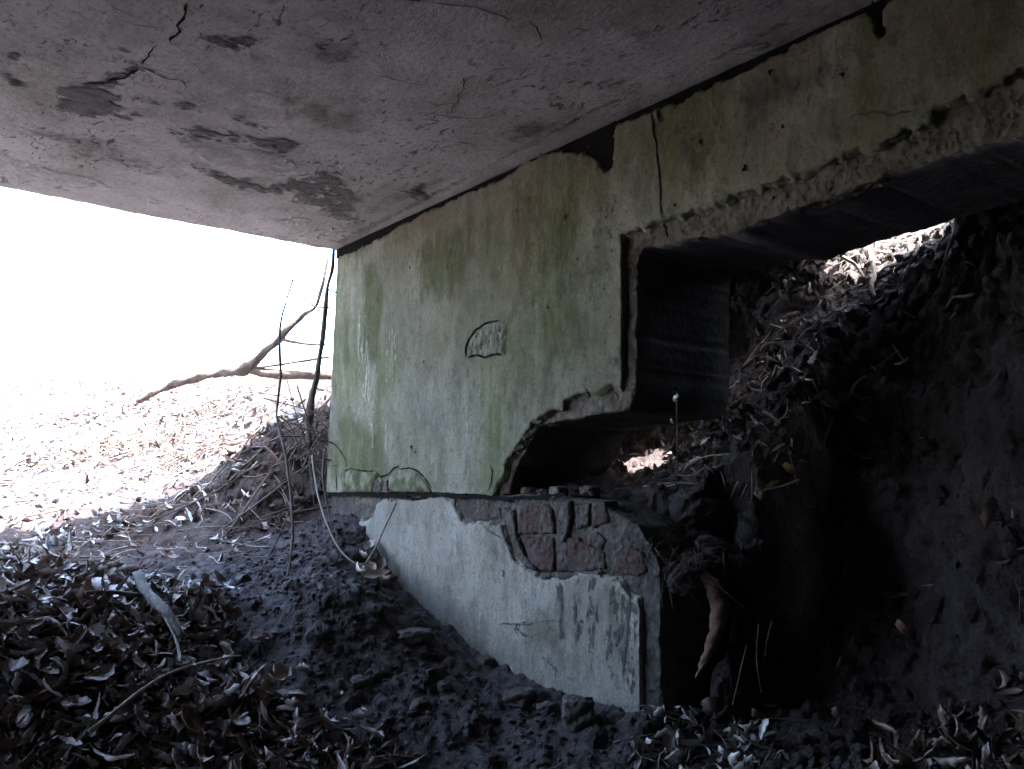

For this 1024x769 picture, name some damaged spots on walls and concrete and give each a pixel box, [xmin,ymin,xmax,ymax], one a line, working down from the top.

crack [78,2,199,89]
spalling [583,121,616,190]
crack [336,0,886,259]
spalling [548,413,625,428]
spalling [468,464,648,580]